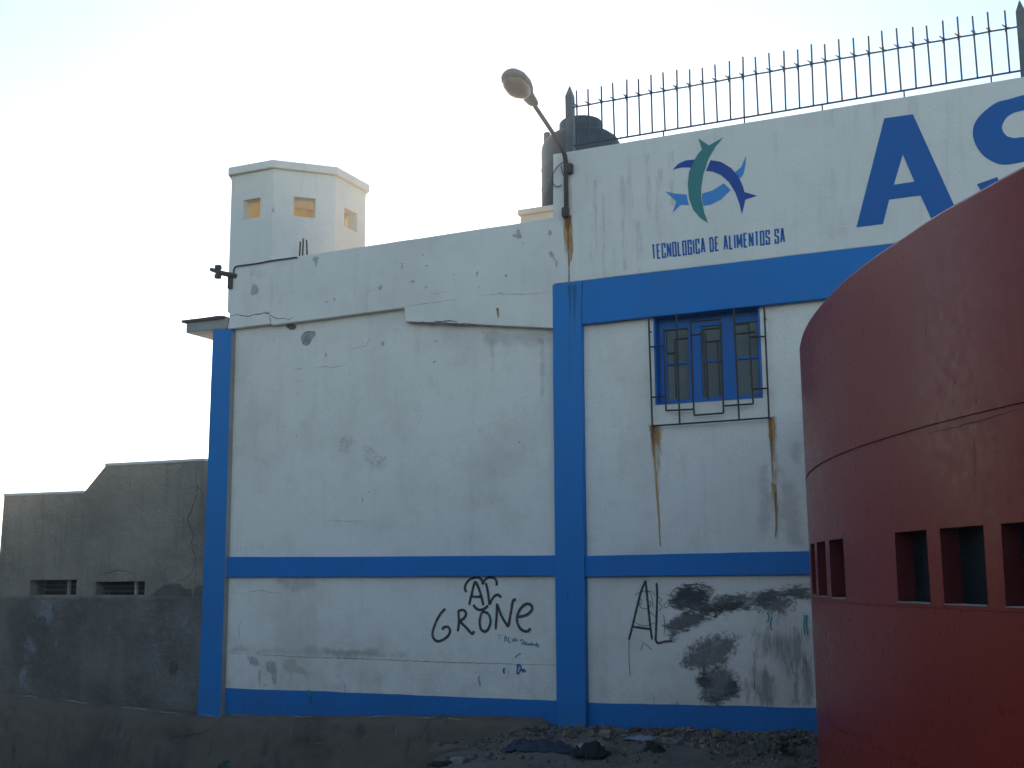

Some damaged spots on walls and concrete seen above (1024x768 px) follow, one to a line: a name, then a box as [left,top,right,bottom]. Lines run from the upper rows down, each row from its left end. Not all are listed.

corrosion [563,215,573,280]
corrosion [651,426,661,546]
corrosion [768,417,777,537]